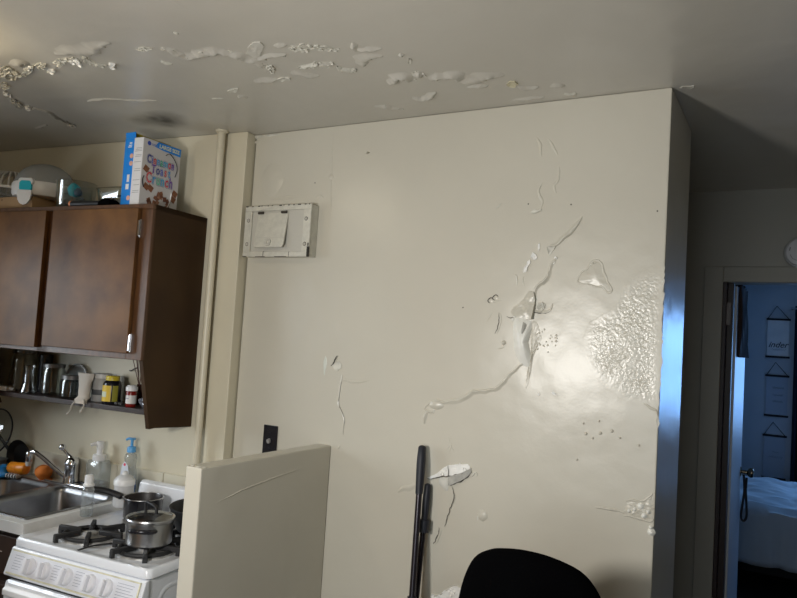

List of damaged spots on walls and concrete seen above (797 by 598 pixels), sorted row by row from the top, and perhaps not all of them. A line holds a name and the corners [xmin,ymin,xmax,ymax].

peeling [0,41,115,105]
crack [337,375,369,449]
spalling [427,463,478,544]